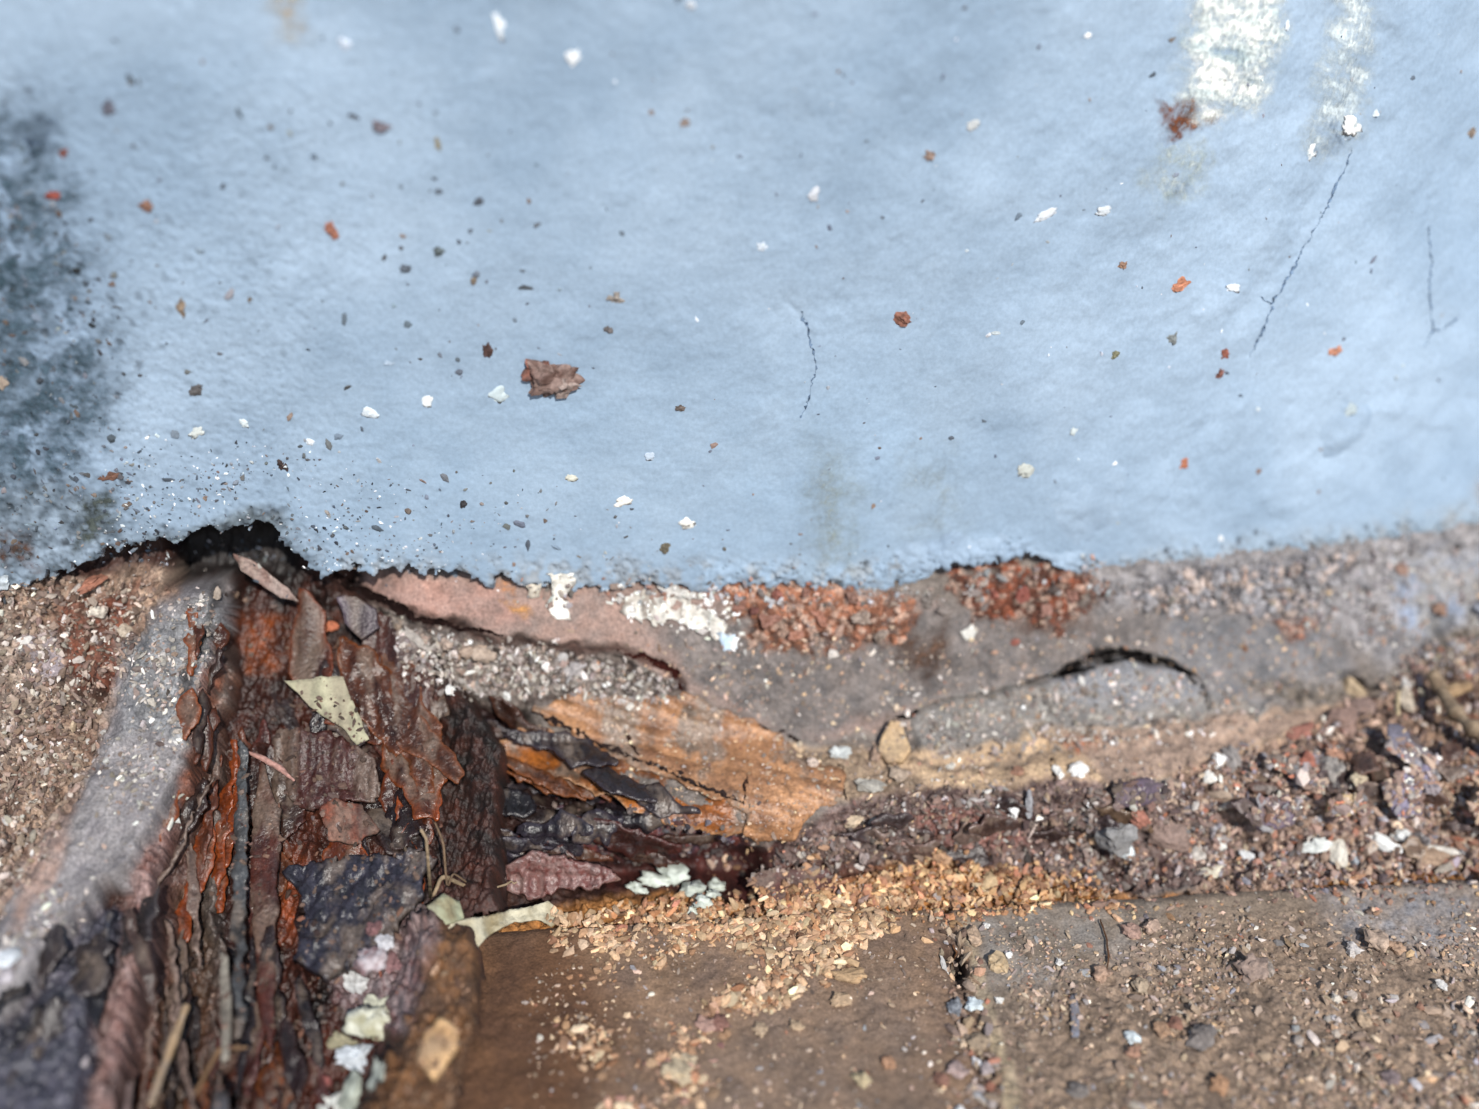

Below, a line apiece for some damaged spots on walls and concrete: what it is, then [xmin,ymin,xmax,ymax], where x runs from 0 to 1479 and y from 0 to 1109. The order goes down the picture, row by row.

crack [1254,149,1352,350]
peeling [525,573,576,620]
spalling [395,618,497,664]
spalling [557,652,587,676]
crack [1014,649,1211,710]
peeling [284,676,369,745]
crack [893,709,919,721]